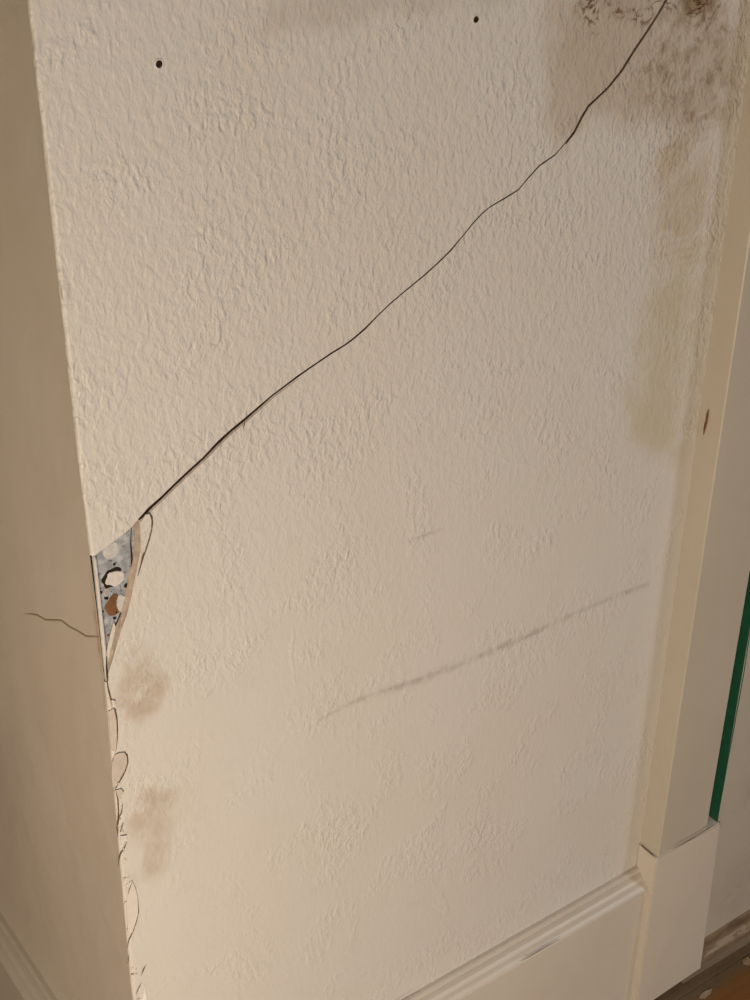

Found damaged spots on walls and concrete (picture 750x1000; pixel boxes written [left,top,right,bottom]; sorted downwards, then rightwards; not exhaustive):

crack [138,0,667,575]
flaking render [92,514,151,865]
peeling [123,877,147,1000]